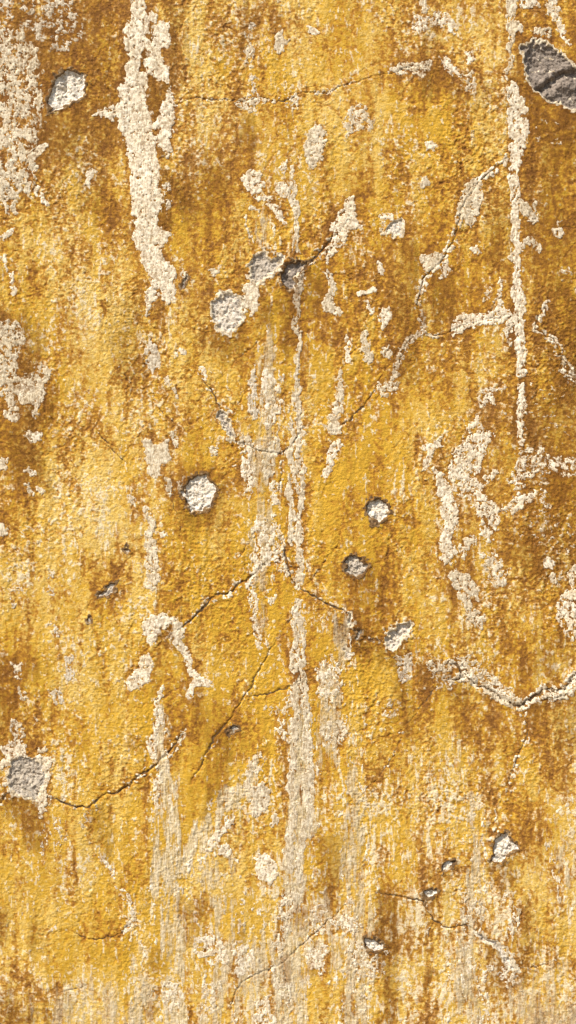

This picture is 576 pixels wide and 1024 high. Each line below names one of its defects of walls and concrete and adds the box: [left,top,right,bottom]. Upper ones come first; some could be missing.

peeling [0,319,52,443]
peeling [0,0,91,241]
peeling [91,0,191,318]
crack [297,225,348,293]
crack [335,153,509,432]
peeling [419,0,576,642]
peeling [95,124,394,1024]
crack [165,535,381,644]
spalling [0,718,68,856]
crack [47,727,186,810]
crack [398,658,576,793]
peeling [419,792,522,1024]